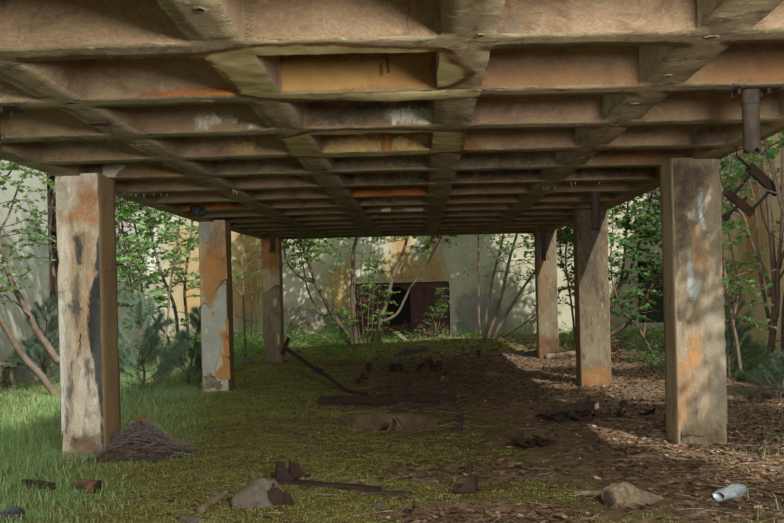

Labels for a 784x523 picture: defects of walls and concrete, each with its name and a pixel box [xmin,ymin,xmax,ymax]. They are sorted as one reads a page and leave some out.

rust [141,87,236,97]
damp [191,42,568,185]
damp [54,182,71,212]
rust [353,186,428,196]
damp [12,237,104,455]
spalling [199,222,230,390]